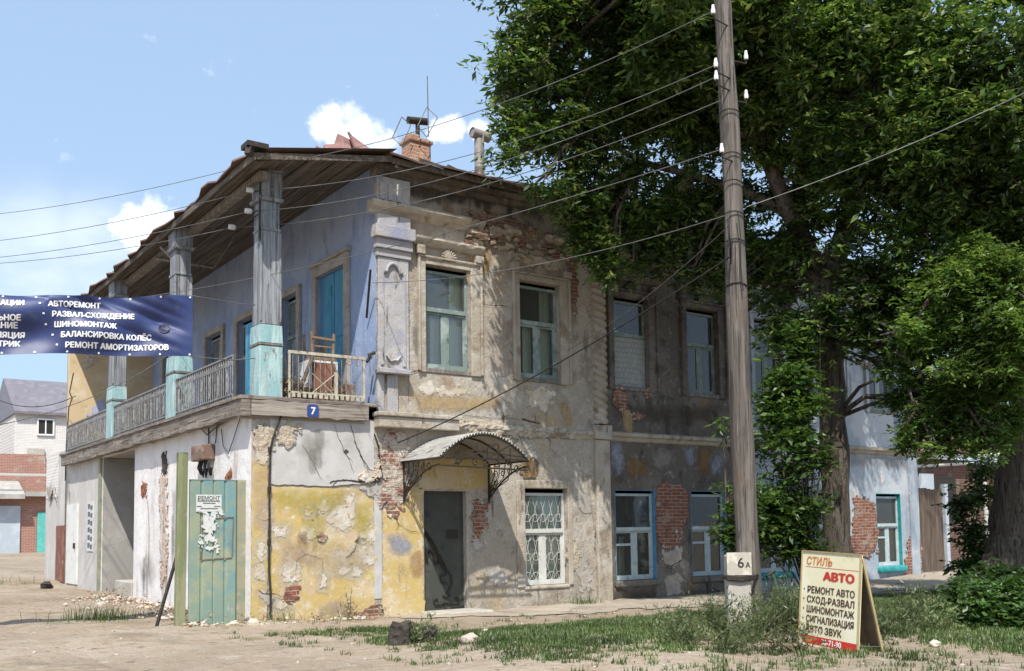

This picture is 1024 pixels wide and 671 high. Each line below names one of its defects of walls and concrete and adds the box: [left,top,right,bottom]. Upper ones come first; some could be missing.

flaking render [461,208,529,241]
flaking render [566,261,580,317]
peeling [418,380,471,398]
peeling [498,374,556,413]
flaking render [252,419,304,465]
crack [303,427,417,532]
peeling [254,506,303,610]
flaking render [303,429,411,588]
flaking render [470,499,489,542]
flaking render [655,481,690,596]
flaking render [851,495,879,558]
flaking render [353,604,386,617]